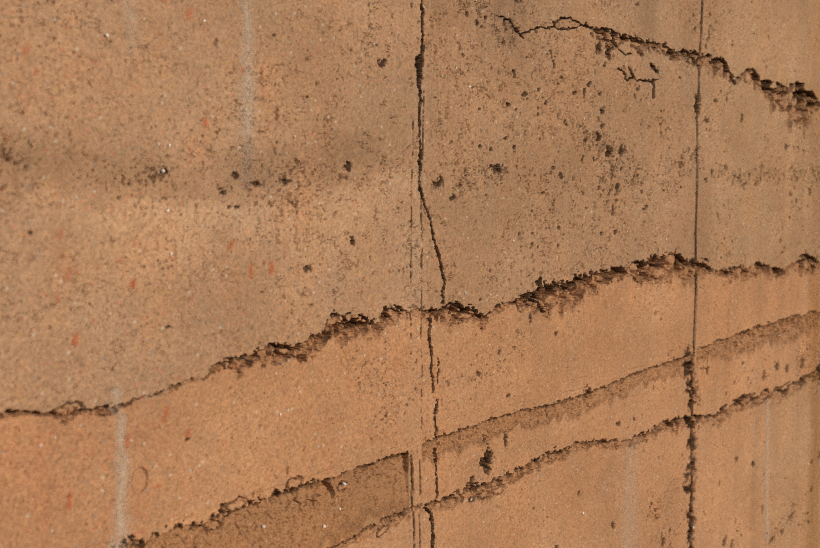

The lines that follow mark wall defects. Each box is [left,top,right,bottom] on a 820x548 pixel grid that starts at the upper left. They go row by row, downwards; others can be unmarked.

crack [414,45,422,83]
crack [499,16,592,37]
crack [205,254,820,378]
crack [6,402,113,424]
spalling [118,452,409,548]
crack [331,365,820,548]